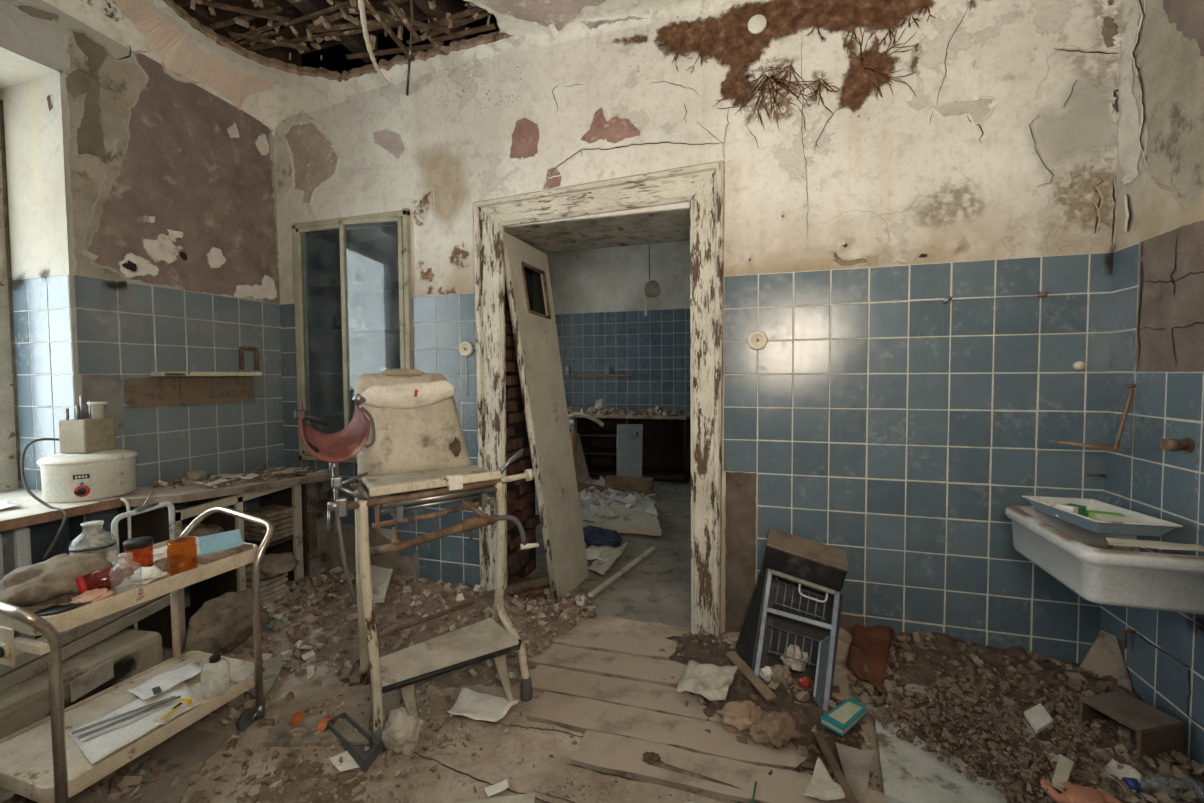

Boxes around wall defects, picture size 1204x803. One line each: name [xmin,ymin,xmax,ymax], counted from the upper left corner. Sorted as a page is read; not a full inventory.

peeling [13,0,341,304]
peeling [508,116,563,190]
peeling [472,0,741,39]
peeling [579,106,642,146]
crack [542,81,759,188]
crack [801,29,837,234]
peeling [907,65,997,127]
crack [1029,0,1146,188]
crack [1094,176,1204,365]
peeling [1095,0,1204,372]